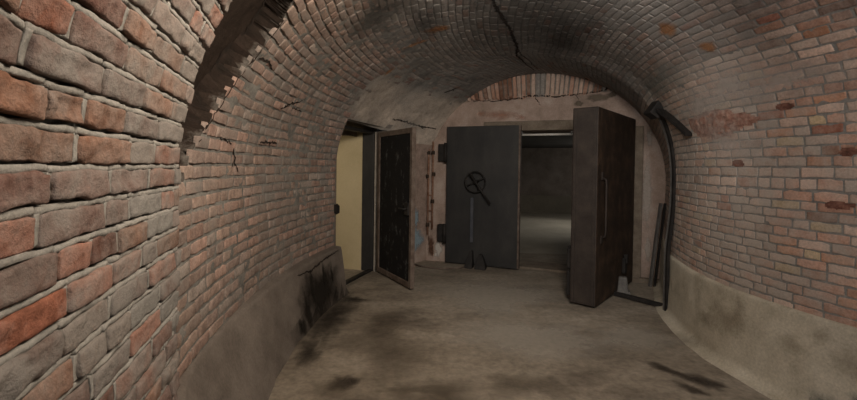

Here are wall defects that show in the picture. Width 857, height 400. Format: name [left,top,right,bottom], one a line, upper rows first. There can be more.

crack [492,0,535,70]
crack [180,0,288,171]
crack [392,119,436,129]
spalling [689,109,761,140]
leakage [299,267,362,360]